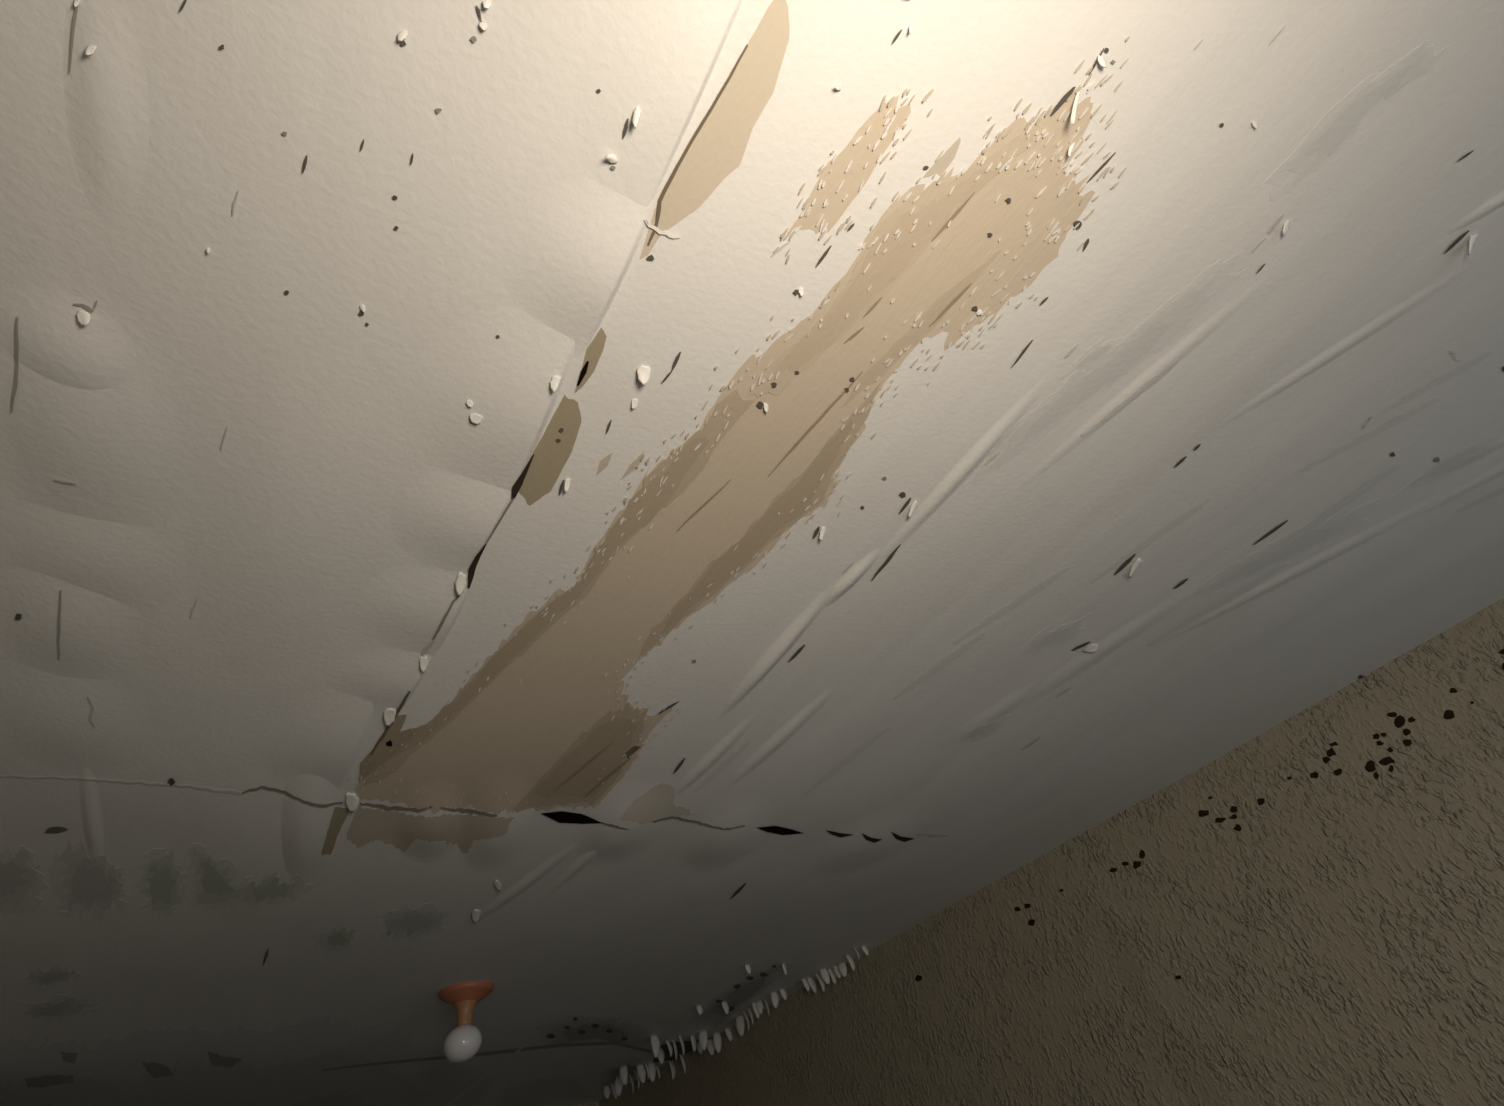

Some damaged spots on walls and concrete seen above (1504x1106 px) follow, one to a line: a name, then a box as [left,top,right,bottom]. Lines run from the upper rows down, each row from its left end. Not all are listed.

crack [648,44,748,245]
crack [772,223,855,267]
crack [577,361,589,385]
crack [662,352,681,383]
peeling [346,83,1095,814]
crack [485,454,564,544]
crack [842,498,911,581]
damp [1310,742,1342,779]
damp [1365,712,1416,779]
damp [1198,796,1241,832]
mould [0,827,314,924]
damp [0,954,802,1106]